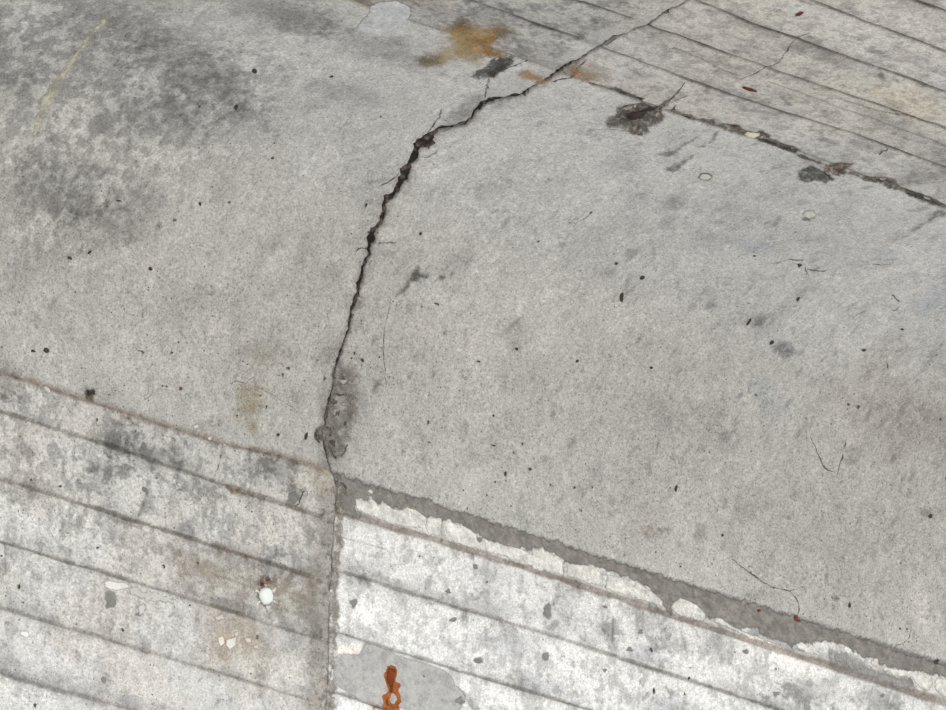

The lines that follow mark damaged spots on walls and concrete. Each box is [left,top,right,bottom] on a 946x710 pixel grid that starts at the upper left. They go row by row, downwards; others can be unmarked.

rust [419,23,508,66]
crack [740,32,810,80]
crack [661,82,686,110]
spalling [589,82,946,207]
crack [314,34,621,496]
crack [810,436,847,475]
peeling [336,473,946,697]
crack [732,559,802,616]
rust [373,664,402,710]
peeling [330,644,478,710]
peeling [773,683,810,710]